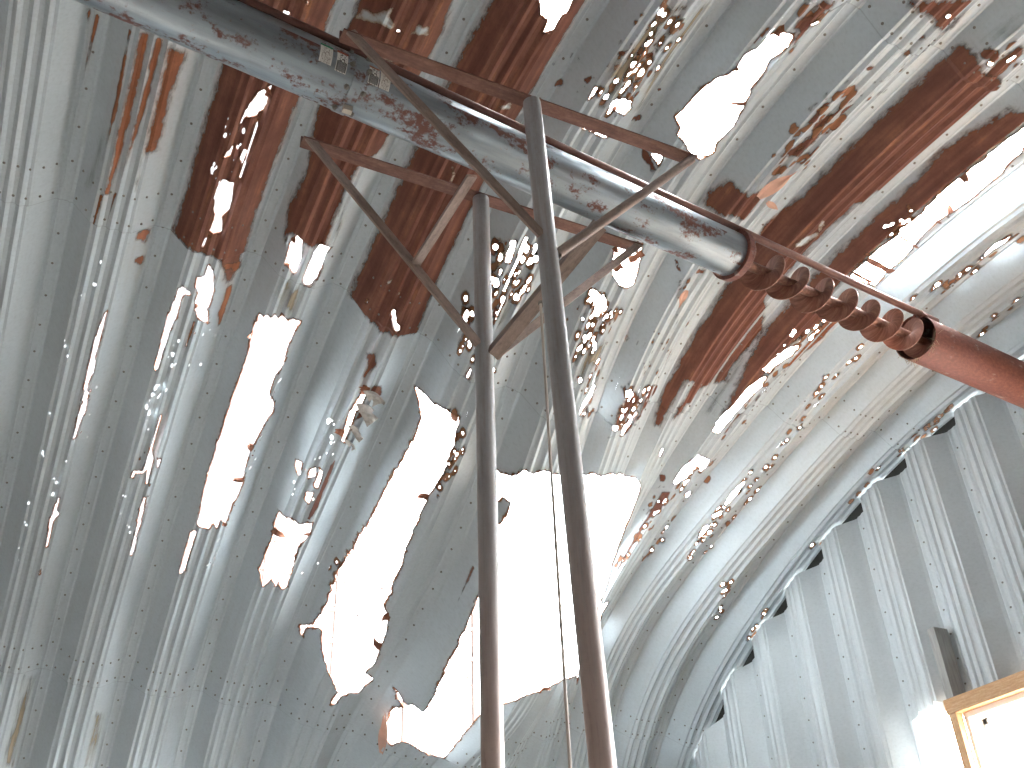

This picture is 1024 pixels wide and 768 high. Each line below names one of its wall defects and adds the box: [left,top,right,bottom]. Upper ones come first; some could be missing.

rust [93,29,186,224]
rust [172,64,299,325]
rust [258,0,336,32]
rust [284,105,389,248]
rust [347,0,453,58]
rust [350,145,484,337]
rust [455,0,585,95]
rust [607,43,658,101]
rust [704,41,1024,289]
rust [909,0,972,31]
rust [616,279,837,439]
rust [619,475,670,568]